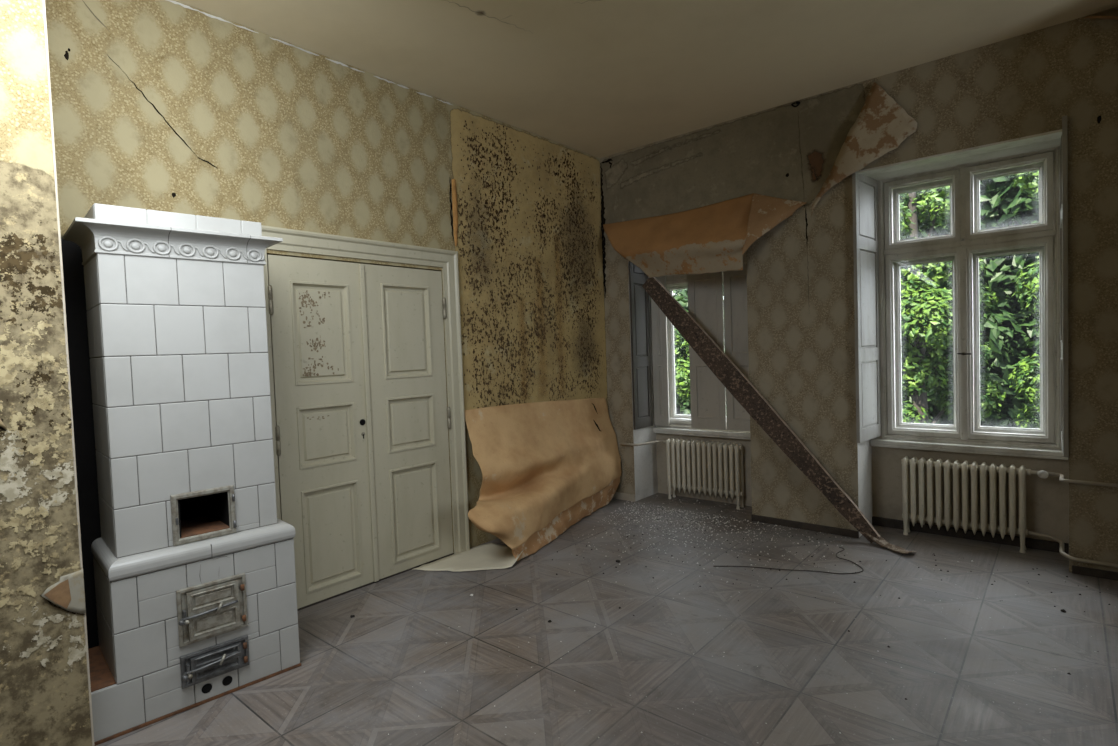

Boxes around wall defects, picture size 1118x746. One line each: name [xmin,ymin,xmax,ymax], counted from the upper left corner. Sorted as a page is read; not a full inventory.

crack [82,0,217,168]
flaking render [167,0,258,33]
flaking render [271,38,865,422]
peeling [0,161,92,746]